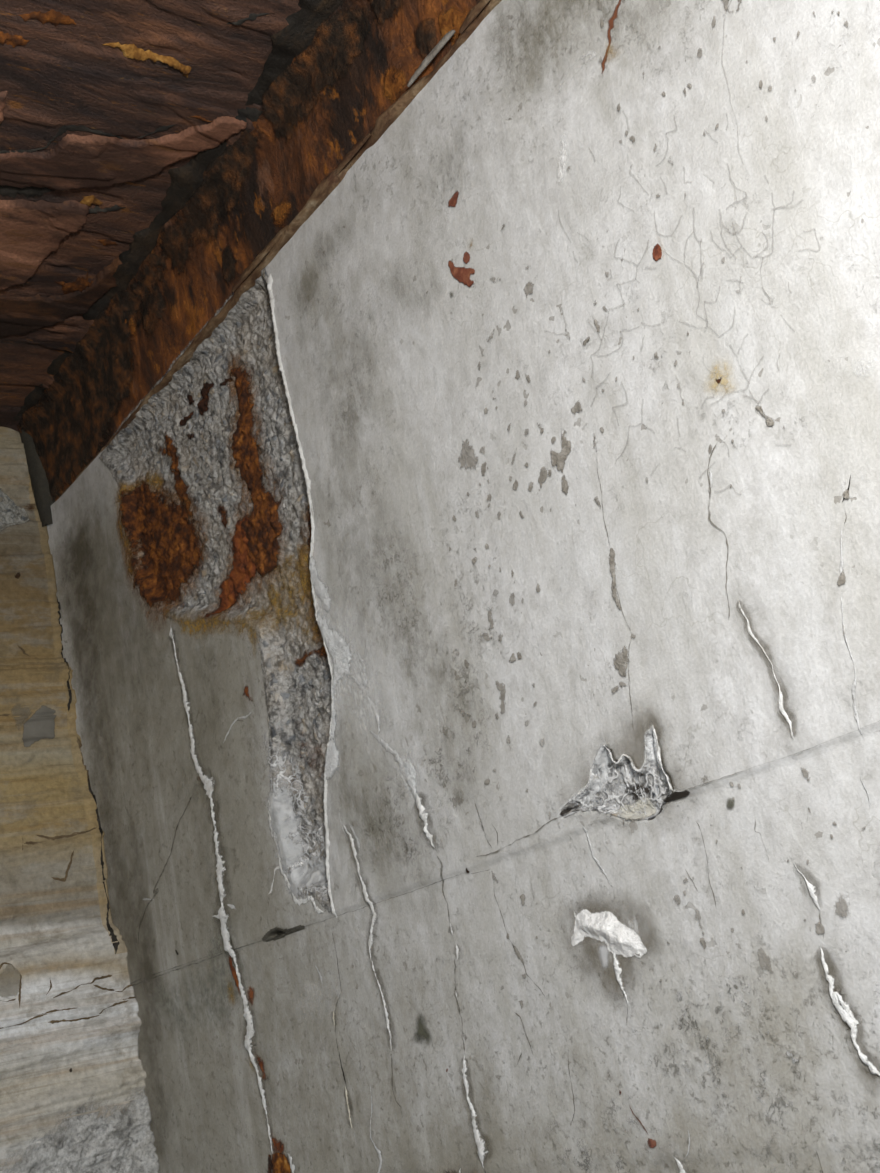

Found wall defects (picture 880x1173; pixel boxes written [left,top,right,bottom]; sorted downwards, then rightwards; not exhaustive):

corrosion [103,42,192,78]
corrosion [601,0,621,73]
corrosion [448,252,475,287]
spalling [100,268,333,914]
corrosion [117,359,327,667]
crack [707,445,805,751]
crack [0,590,304,1173]
crack [315,812,401,1173]
crack [343,649,613,1173]
crack [794,864,880,1076]
corrosion [267,1138,291,1173]
crack [673,1131,690,1173]